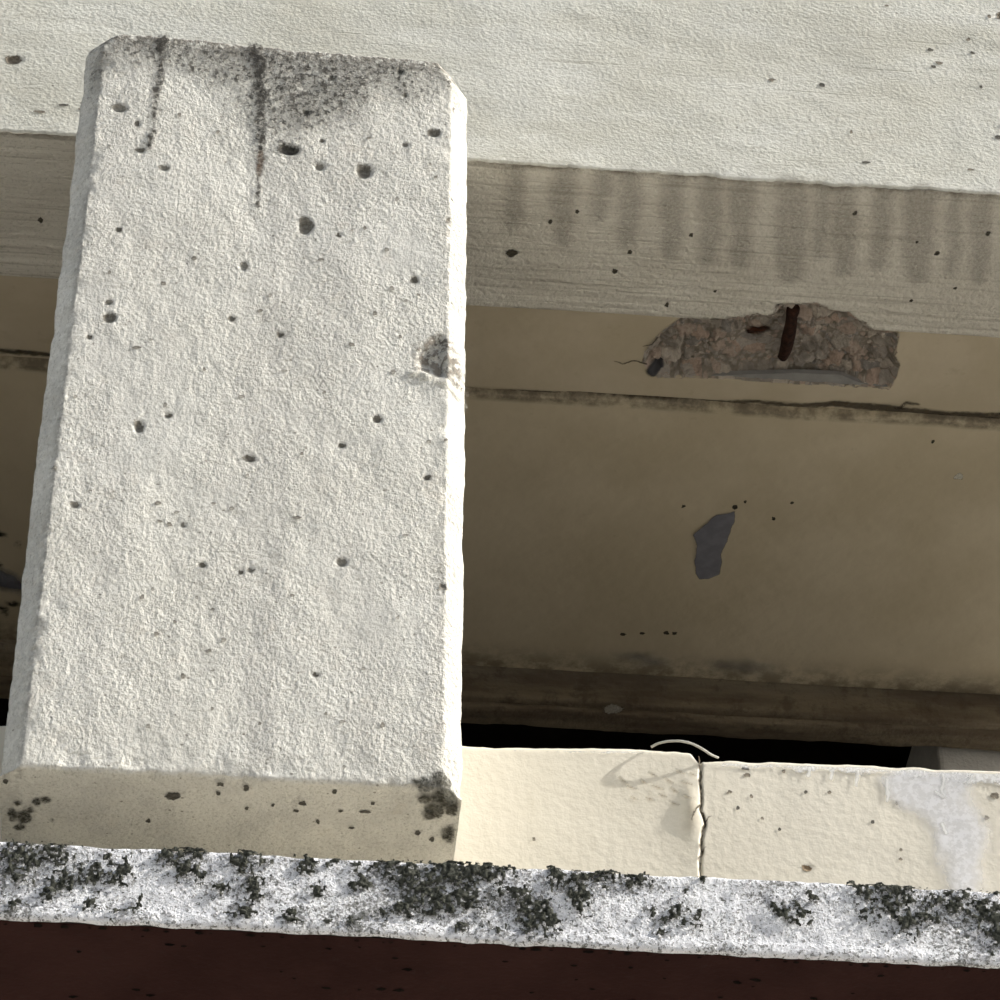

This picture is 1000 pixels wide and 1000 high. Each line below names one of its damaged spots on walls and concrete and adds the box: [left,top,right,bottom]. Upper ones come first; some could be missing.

leakage [147,35,169,149]
leakage [249,43,266,208]
spalling [618,302,900,390]
peeling [693,500,747,579]
crack [692,756,710,871]
leakage [884,770,987,892]